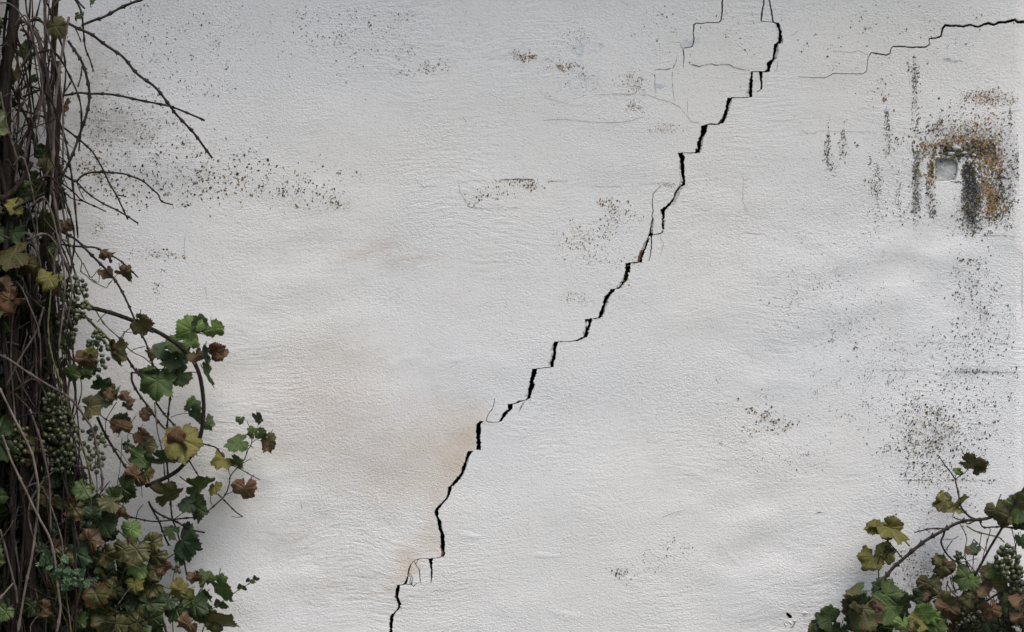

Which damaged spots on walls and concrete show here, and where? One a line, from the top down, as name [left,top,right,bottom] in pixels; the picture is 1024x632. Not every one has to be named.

water stain [63,1,359,218]
water stain [268,3,415,83]
crack [808,18,1024,78]
rust [898,86,1019,224]
crack [371,0,784,632]
water stain [760,56,1020,594]